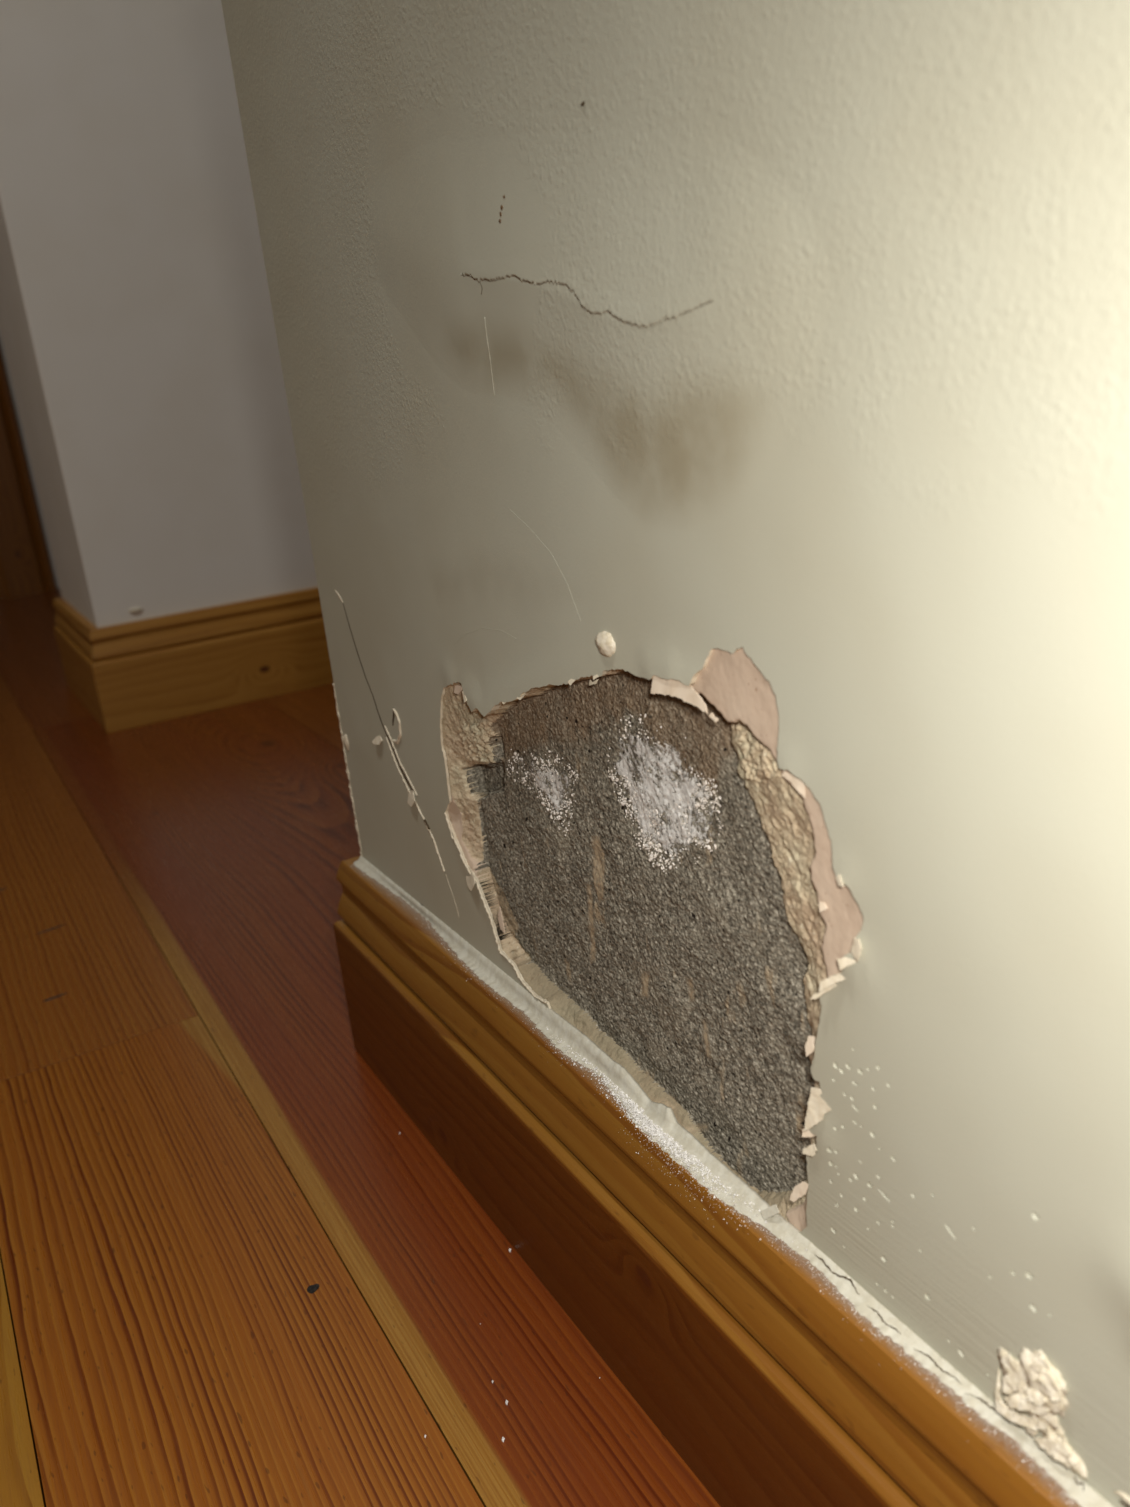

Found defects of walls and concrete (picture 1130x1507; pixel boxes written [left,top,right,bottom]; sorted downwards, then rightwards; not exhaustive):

crack [459,256,713,328]
spalling [442,648,895,1231]
peeling [986,1347,1088,1480]